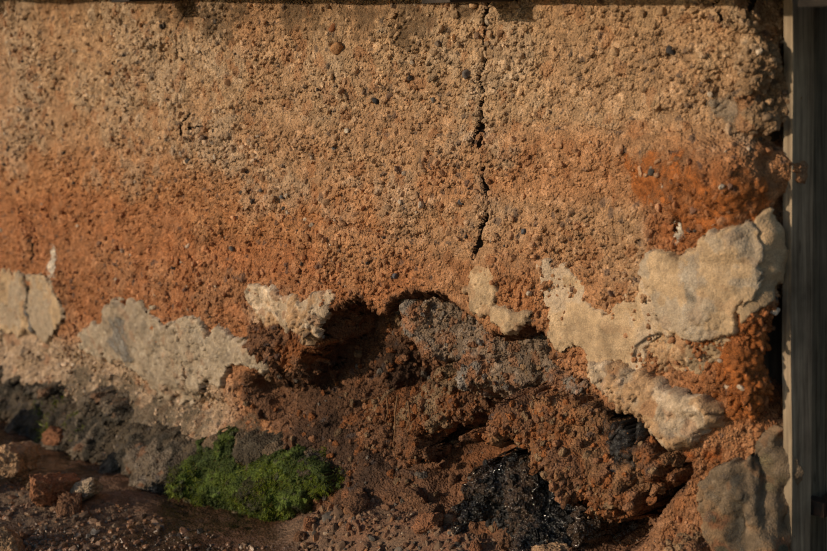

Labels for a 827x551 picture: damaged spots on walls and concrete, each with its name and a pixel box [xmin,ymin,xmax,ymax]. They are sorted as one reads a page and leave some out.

crack [471,2,490,261]
peeling [0,268,67,344]
spalling [77,207,789,525]
spalling [467,515,503,542]
spalling [585,482,687,551]
peeling [696,413,805,551]